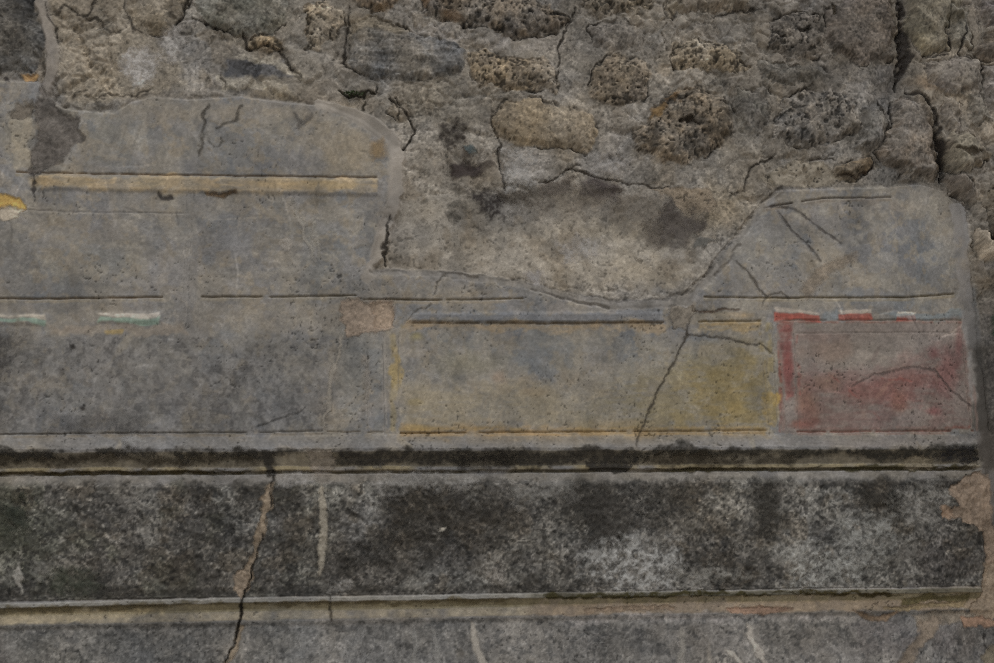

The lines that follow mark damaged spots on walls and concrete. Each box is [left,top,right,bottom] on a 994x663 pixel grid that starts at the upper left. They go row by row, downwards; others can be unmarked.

crack [930,25,969,58]
flaking render [10,74,85,174]
spalling [205,189,237,198]
flaking render [760,160,841,188]
crack [772,206,835,250]
crack [637,308,770,439]
water stain [0,436,302,476]
water stain [333,440,979,545]
crack [224,475,275,663]
flaking render [856,472,994,627]